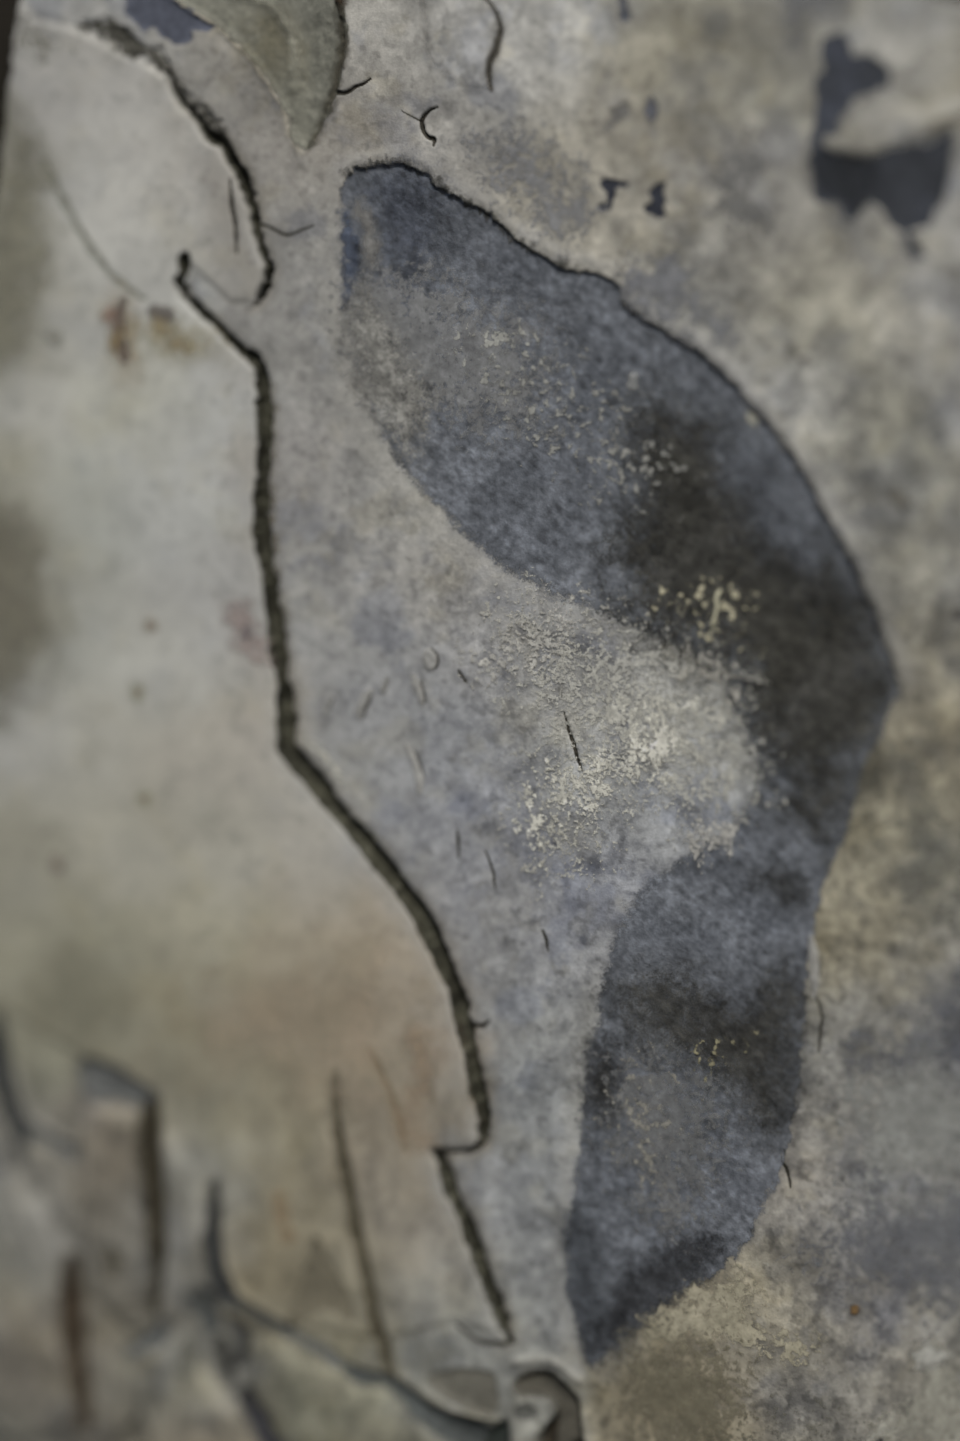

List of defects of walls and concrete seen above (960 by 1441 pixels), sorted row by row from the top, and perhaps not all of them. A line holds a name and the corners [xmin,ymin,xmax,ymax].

spalling [75,0,348,207]
crack [171,76,312,306]
crack [336,78,371,95]
crack [404,106,438,146]
peeling [598,178,628,212]
peeling [643,182,668,219]
peeling [808,32,956,259]
crack [174,252,515,1346]
crack [564,712,582,769]
damp [324,115,911,1366]
damp [802,962,960,1441]